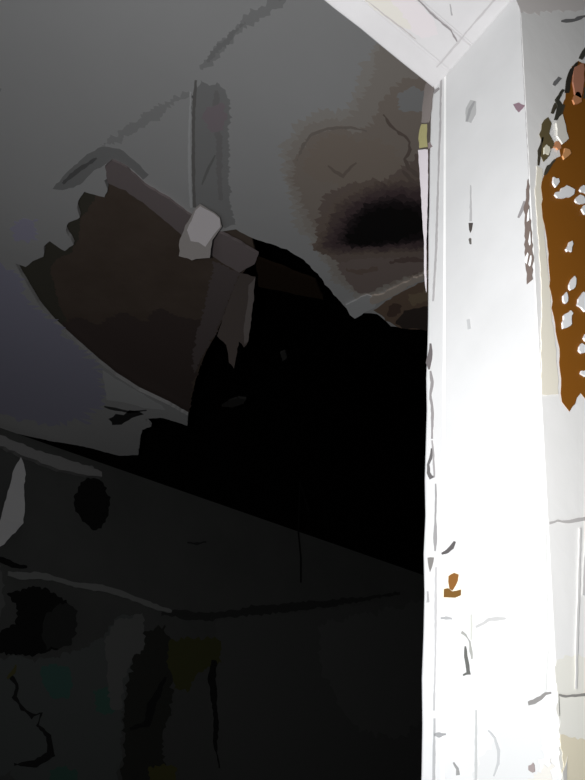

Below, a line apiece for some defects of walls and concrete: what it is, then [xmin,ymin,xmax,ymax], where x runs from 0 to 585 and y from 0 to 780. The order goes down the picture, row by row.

water stain [278,43,431,299]
water stain [395,306,428,331]
rust [444,573,461,598]